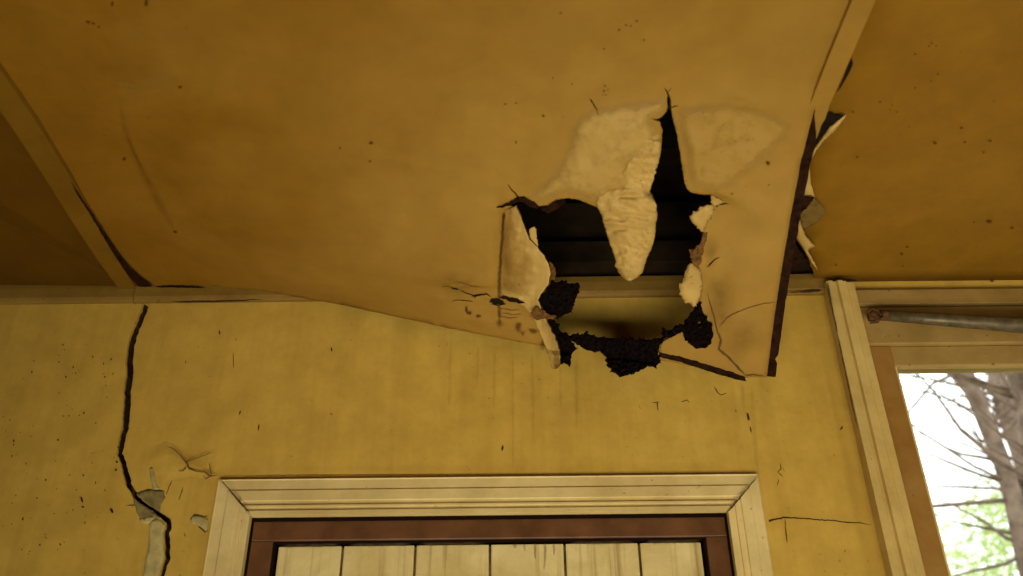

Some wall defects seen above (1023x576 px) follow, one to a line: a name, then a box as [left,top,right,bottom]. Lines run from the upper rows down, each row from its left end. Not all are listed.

peeling [500,205,561,369]
peeling [133,467,165,576]
crack [116,304,250,576]
crack [769,517,871,541]